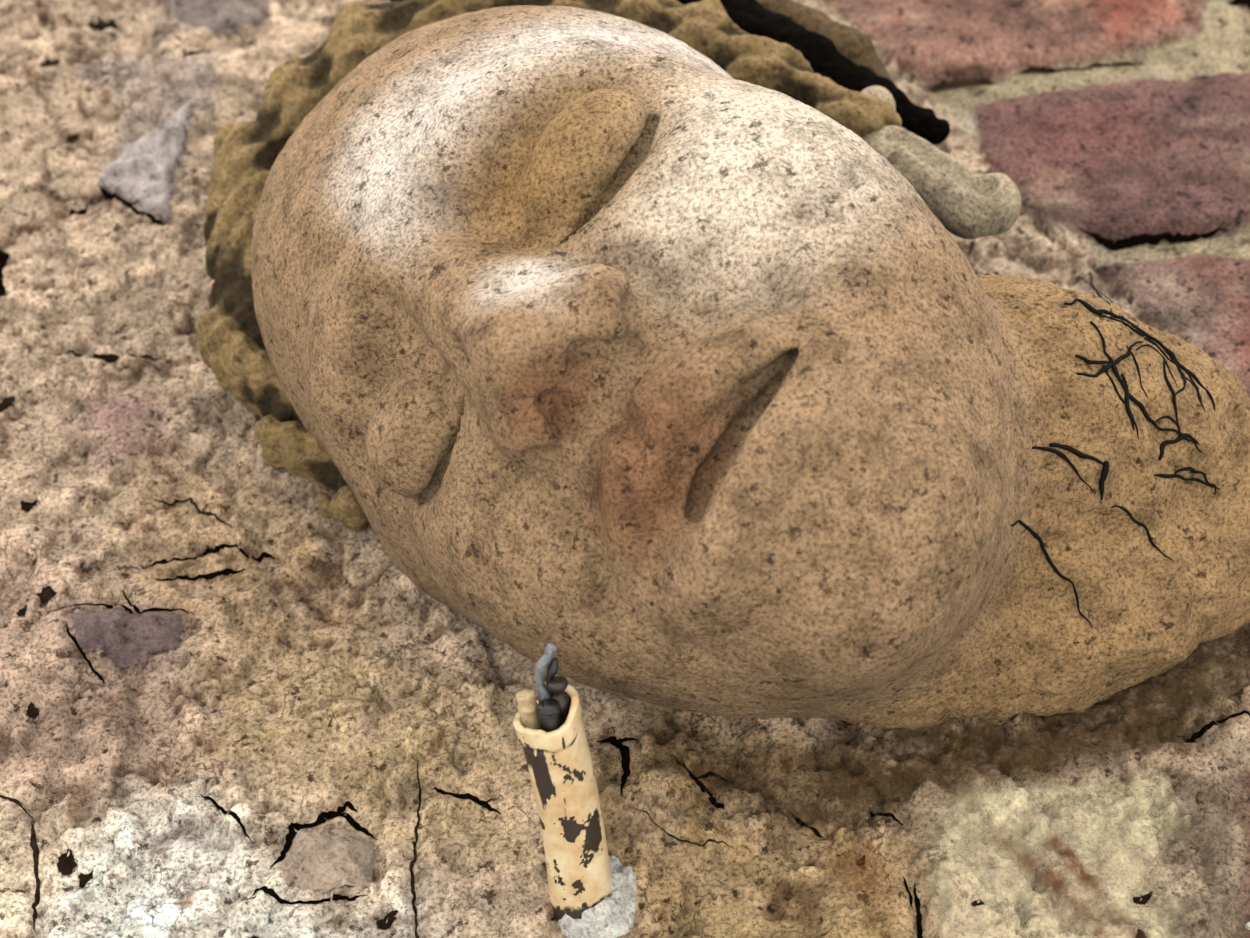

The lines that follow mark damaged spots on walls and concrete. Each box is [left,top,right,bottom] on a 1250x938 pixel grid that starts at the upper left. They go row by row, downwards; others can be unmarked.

crack [50,497,277,684]
crack [0,795,40,935]
crack [201,795,380,904]
crack [409,759,502,938]
crack [902,875,923,938]